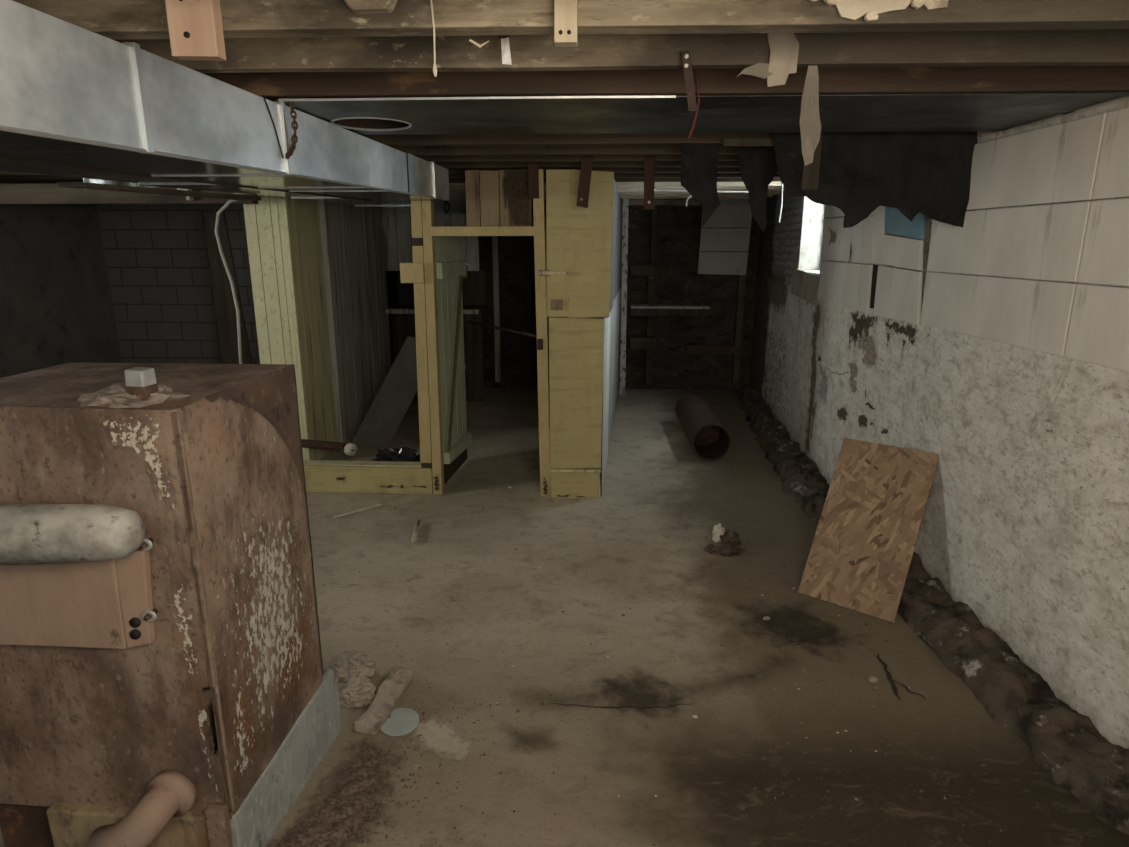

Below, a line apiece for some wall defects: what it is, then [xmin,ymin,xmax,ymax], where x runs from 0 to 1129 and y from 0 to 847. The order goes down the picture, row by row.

flaking render [810,0,948,22]
flaking render [847,331,878,393]
flaking render [837,405,891,437]
damp [753,607,843,653]
damp [605,672,678,713]